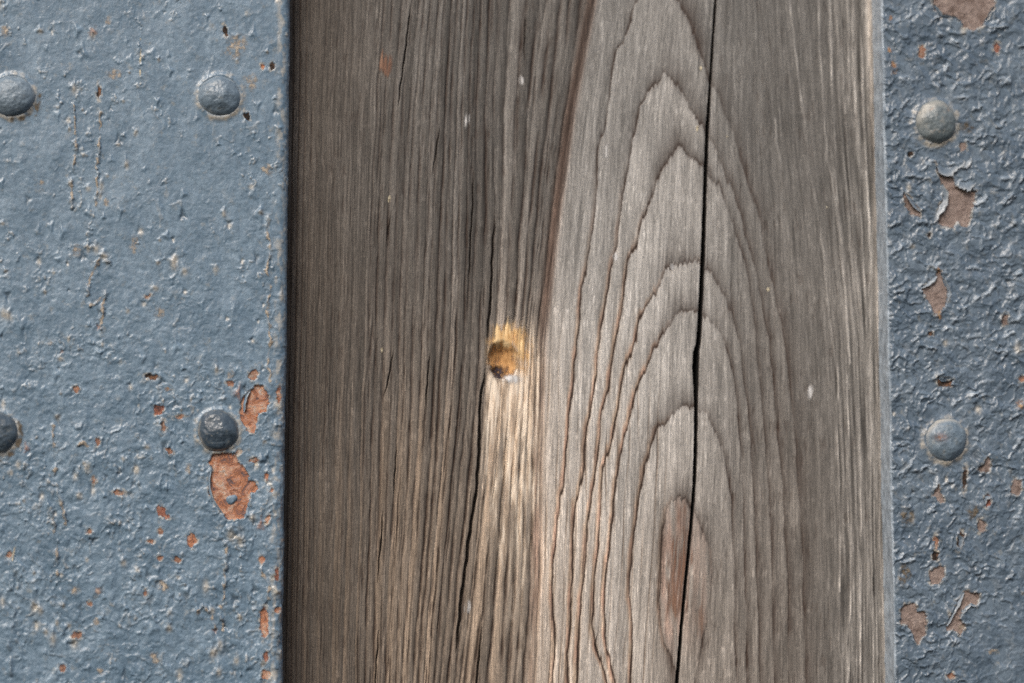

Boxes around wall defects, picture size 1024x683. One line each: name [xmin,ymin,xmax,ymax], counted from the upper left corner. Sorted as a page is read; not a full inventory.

peeling [933,0,996,31]
peeling [903,142,977,238]
crack [468,174,495,340]
peeling [921,270,951,314]
crack [675,0,716,683]
crack [456,375,485,683]
peeling [900,603,927,645]
peeling [945,591,980,635]